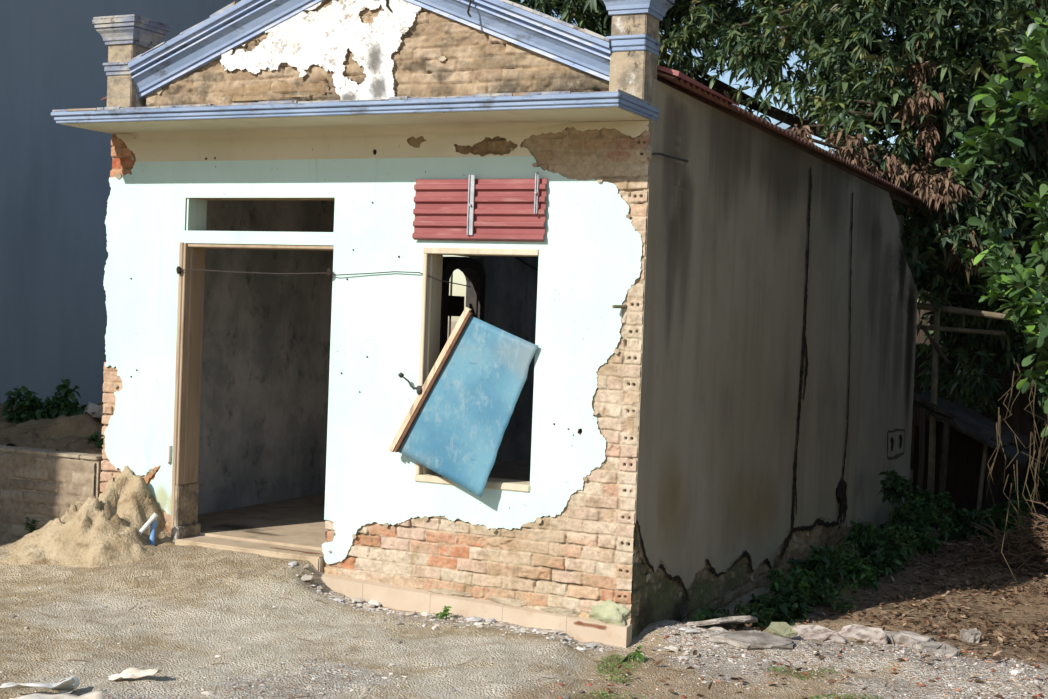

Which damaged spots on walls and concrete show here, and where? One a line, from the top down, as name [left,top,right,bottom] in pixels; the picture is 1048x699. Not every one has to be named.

flaking render [146,0,609,107]
spalling [110,135,136,180]
flaking render [99,362,123,496]
flaking render [323,124,893,640]
crack [706,168,853,577]
leakage [898,246,915,406]
flaking render [157,504,171,533]
crack [637,520,689,602]